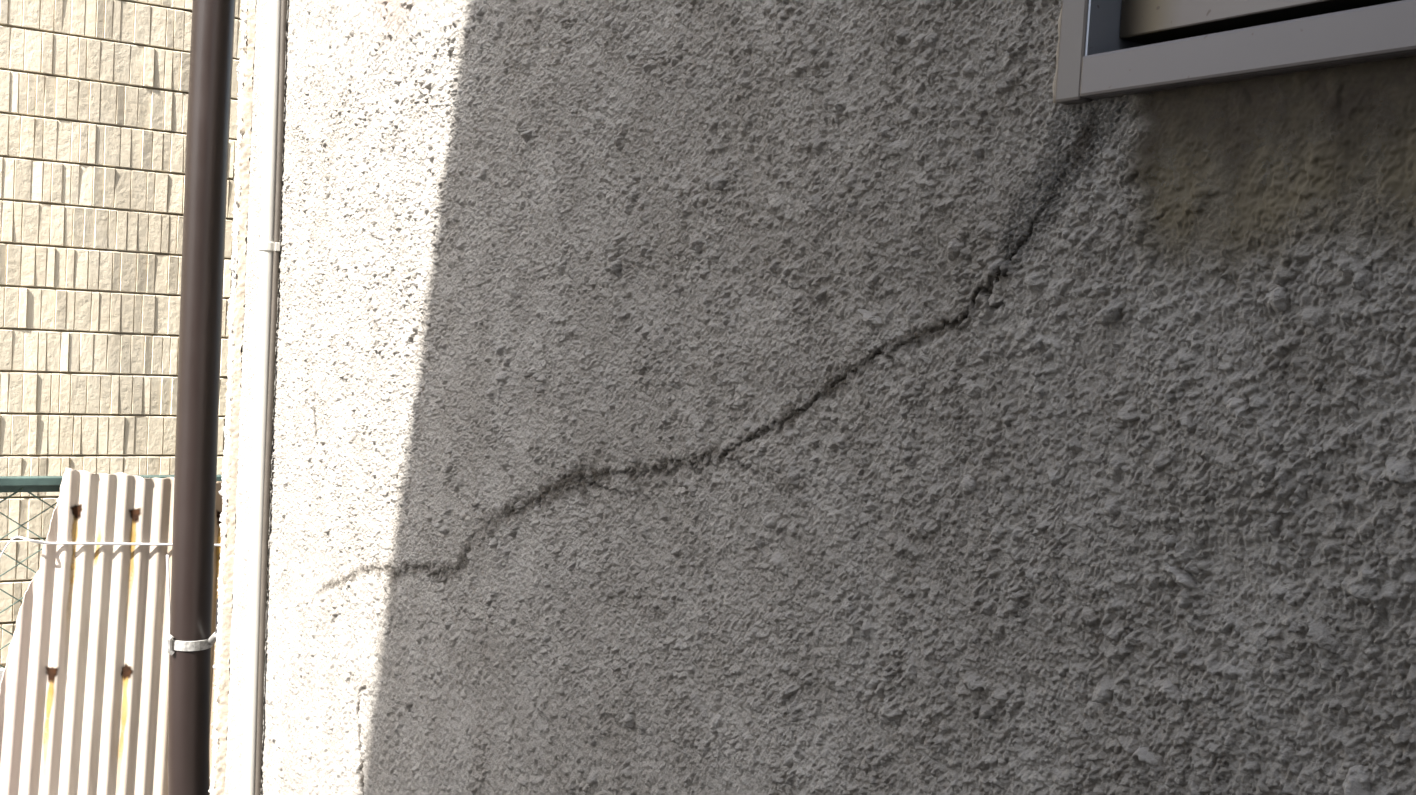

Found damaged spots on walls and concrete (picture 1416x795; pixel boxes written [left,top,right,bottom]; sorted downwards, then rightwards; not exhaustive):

crack [327,222,1037,587]